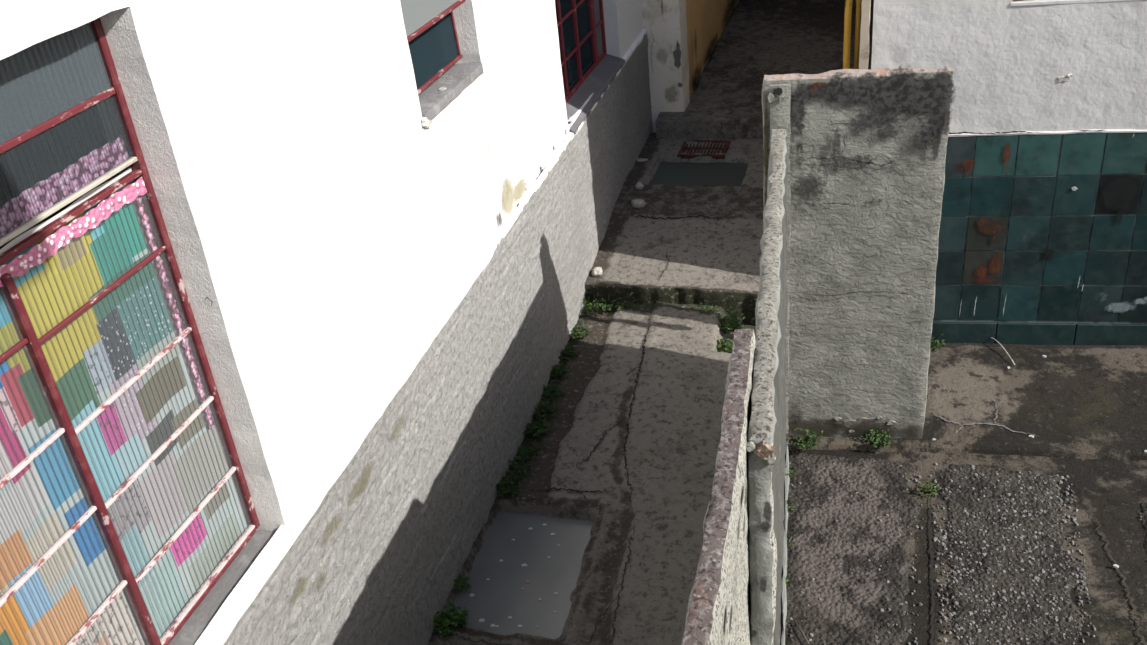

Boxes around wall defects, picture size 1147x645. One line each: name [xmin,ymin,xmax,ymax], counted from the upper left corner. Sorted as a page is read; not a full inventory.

peeling [672,40,682,87]
water stain [792,65,955,207]
crack [528,312,651,645]